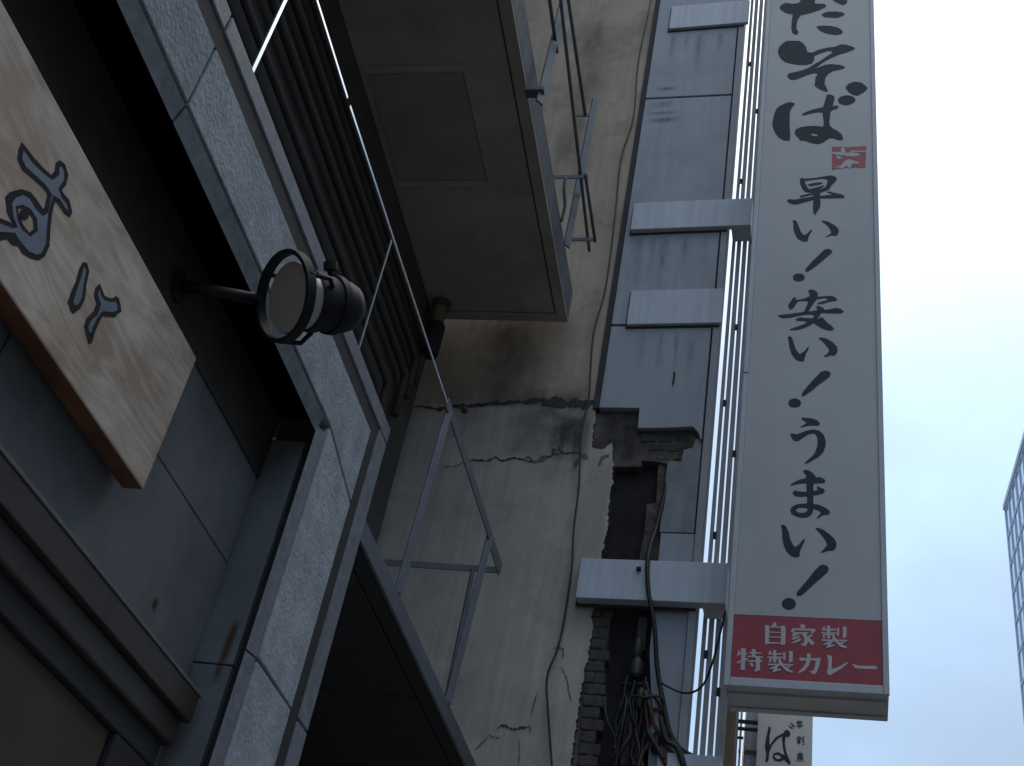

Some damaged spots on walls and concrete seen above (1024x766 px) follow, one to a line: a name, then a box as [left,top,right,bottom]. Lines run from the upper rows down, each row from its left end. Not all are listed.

crack [413,396,594,413]
crack [438,448,587,467]
spalling [574,413,703,561]
spalling [571,607,615,766]